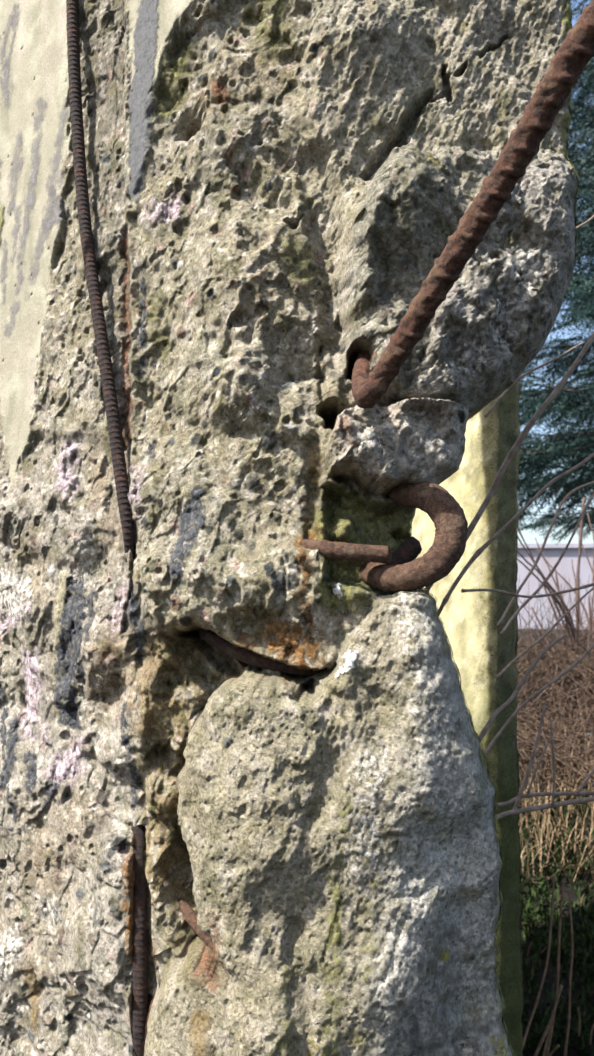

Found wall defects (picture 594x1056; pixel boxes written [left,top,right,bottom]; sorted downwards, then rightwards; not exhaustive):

spalling [352,0,594,409]
rust [121,237,132,447]
spalling [0,0,422,1056]
rust [237,444,342,684]
rust [121,836,135,962]